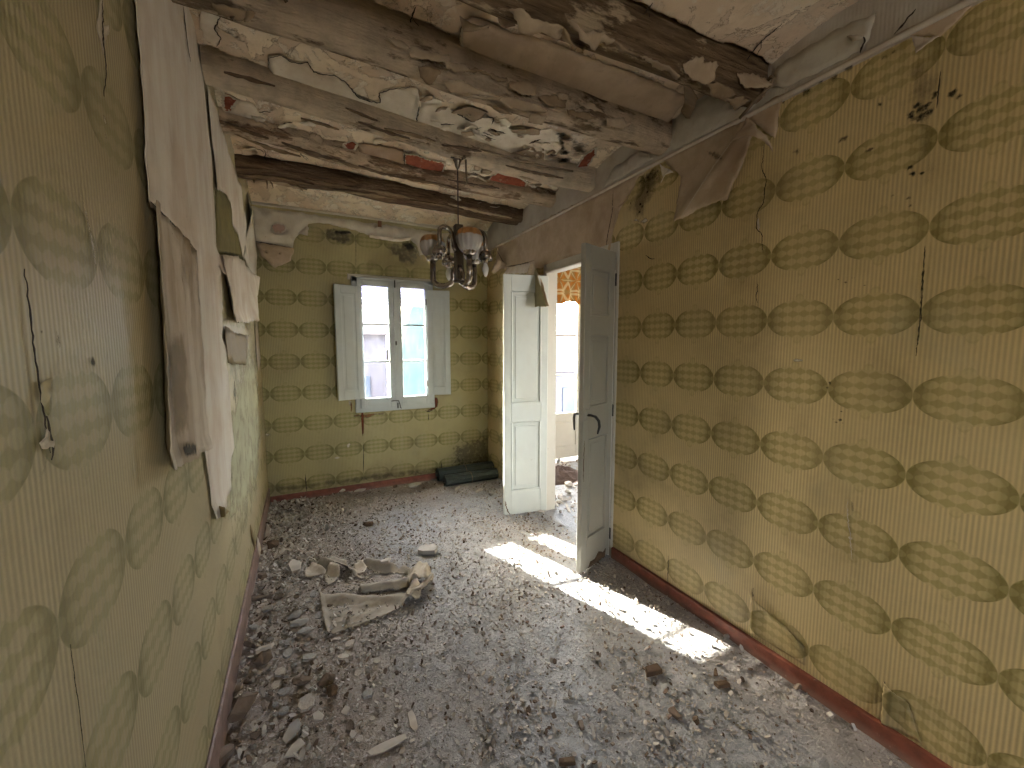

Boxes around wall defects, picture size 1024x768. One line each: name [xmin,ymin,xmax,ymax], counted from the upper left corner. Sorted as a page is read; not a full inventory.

crack [96,0,110,94]
spalling [199,3,256,47]
spalling [221,94,327,144]
peeling [268,8,773,161]
leakage [909,89,962,121]
flaking render [342,138,446,172]
flaking render [460,162,557,191]
flaking render [576,147,598,169]
crack [756,147,767,250]
crack [24,269,55,460]